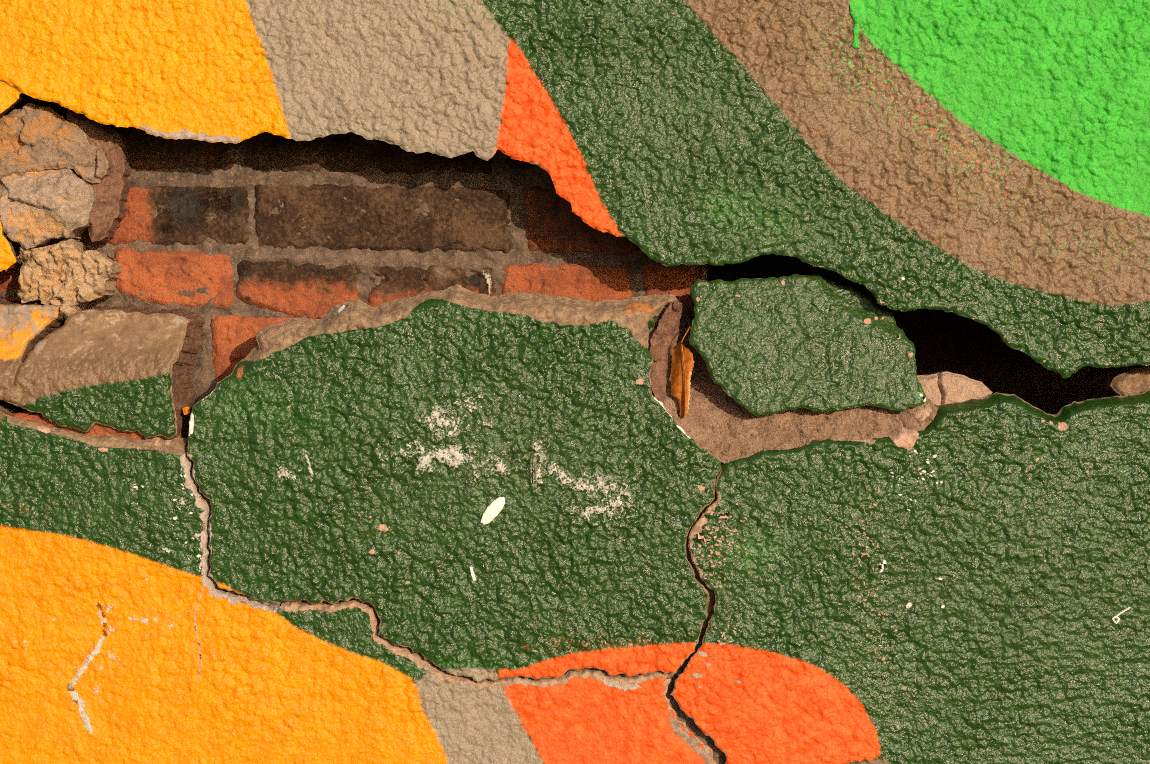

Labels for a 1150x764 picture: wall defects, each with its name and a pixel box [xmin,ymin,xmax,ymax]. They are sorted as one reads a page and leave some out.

spalling [0,93,25,118]
peeling [140,125,261,144]
spalling [0,215,21,271]
spalling [0,296,67,363]
spalling [81,304,213,450]
spalling [0,400,97,435]
peeling [1041,407,1077,433]
crack [180,452,726,764]